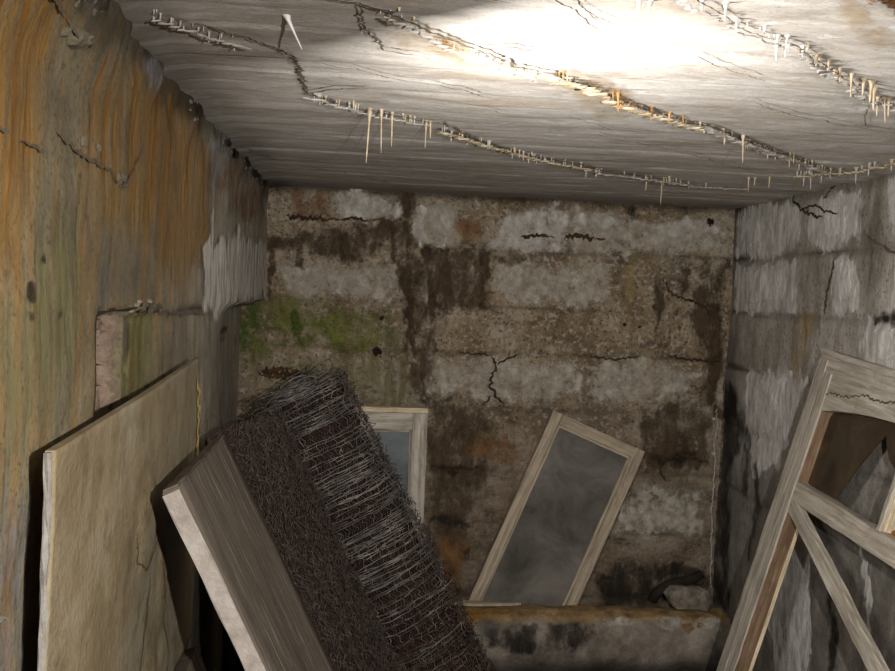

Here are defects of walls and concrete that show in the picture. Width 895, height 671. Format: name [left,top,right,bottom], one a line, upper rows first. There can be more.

crack [144,11,704,185]
leakage [303,93,757,205]
crack [334,0,838,219]
leakage [380,0,895,190]
crack [697,0,895,133]
leakage [266,192,522,596]
crack [460,352,518,406]
leakage [596,261,760,606]
leakage [874,310,895,325]